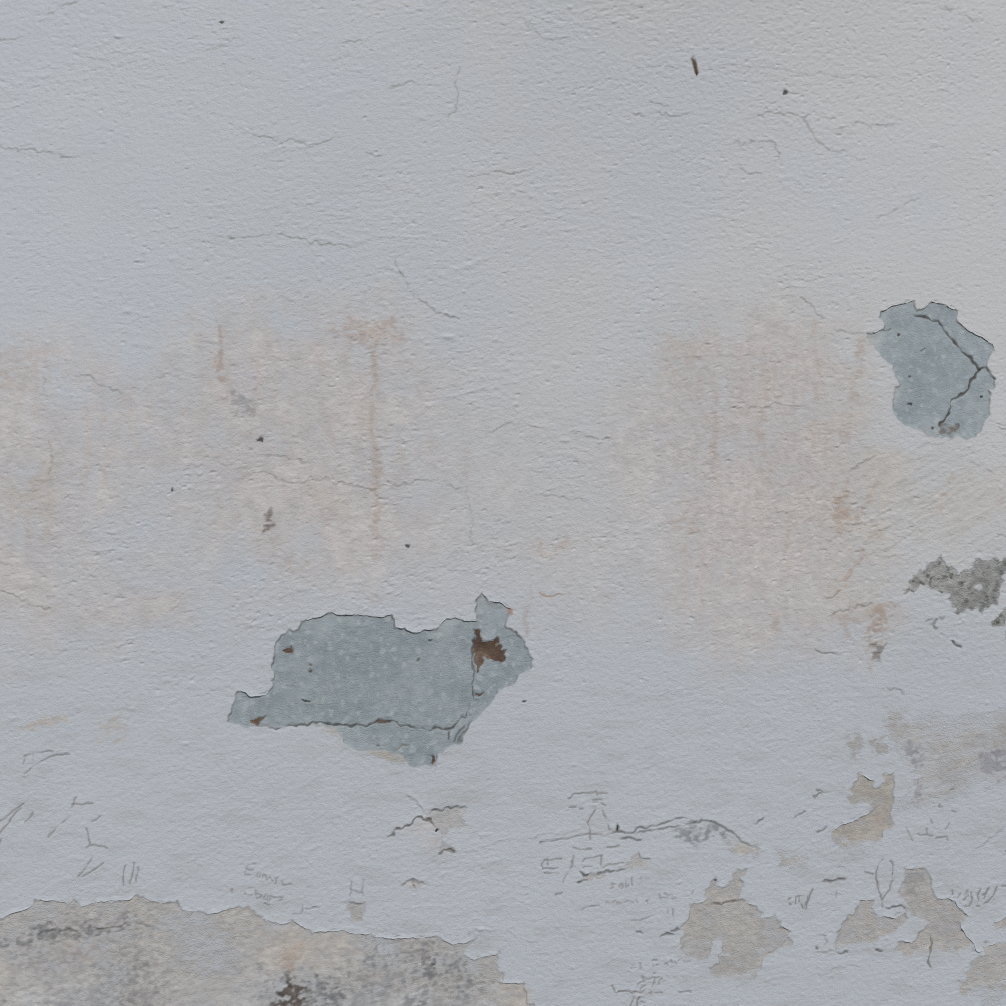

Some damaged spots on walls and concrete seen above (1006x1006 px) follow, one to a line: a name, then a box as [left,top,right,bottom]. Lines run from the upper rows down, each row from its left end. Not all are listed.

peeling [865,298,999,442]
peeling [910,554,1006,640]
peeling [226,592,534,769]
crack [605,816,760,862]
peeling [811,705,1006,855]
peeling [0,892,536,1006]
peeling [658,867,794,984]
peeling [813,864,1006,1006]